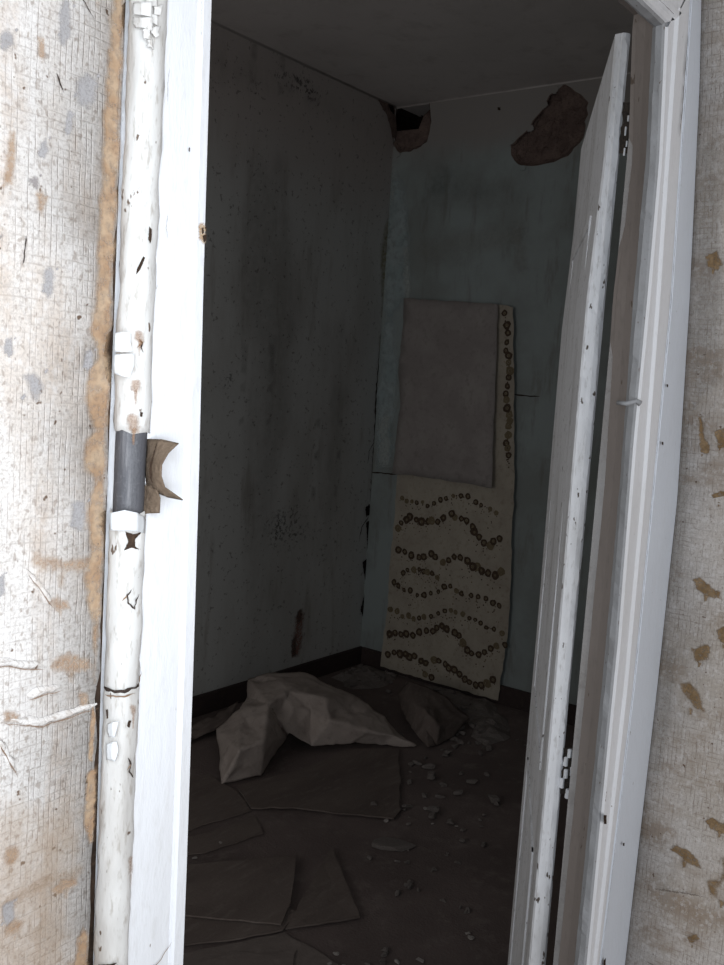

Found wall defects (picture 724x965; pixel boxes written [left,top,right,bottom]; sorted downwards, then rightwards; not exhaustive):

crack [120,2,128,52]
flaking render [378,100,431,158]
flaking render [506,84,589,171]
crack [86,145,142,965]